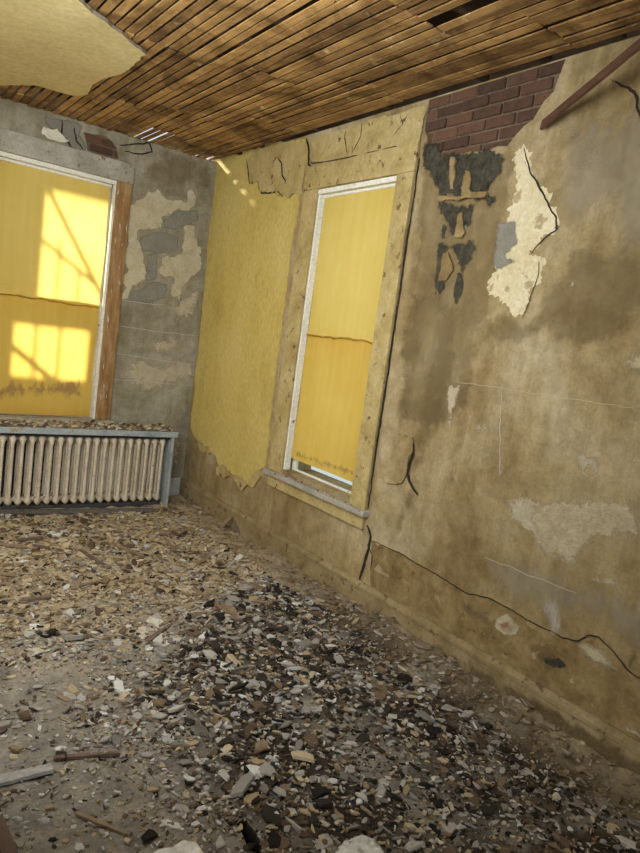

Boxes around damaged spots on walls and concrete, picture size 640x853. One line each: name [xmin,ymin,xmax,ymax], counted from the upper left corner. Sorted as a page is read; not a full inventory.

crack [610,79,640,118]
flaking render [42,118,153,159]
flaking render [422,59,566,318]
peeling [121,138,308,491]
crack [306,106,429,580]
peeling [447,385,460,427]
crack [456,362,631,463]
peeling [509,498,638,565]
crack [485,557,577,594]